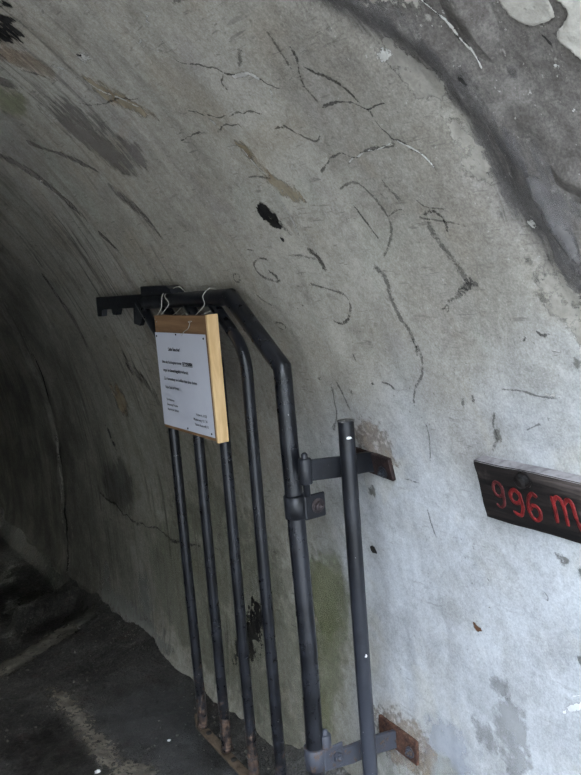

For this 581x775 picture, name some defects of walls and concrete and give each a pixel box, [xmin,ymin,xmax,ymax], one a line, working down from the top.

spalling [364,0,420,8]
crack [421,0,482,69]
flaking render [499,0,581,60]
crack [178,61,279,141]
crack [275,125,320,142]
crack [320,110,435,173]